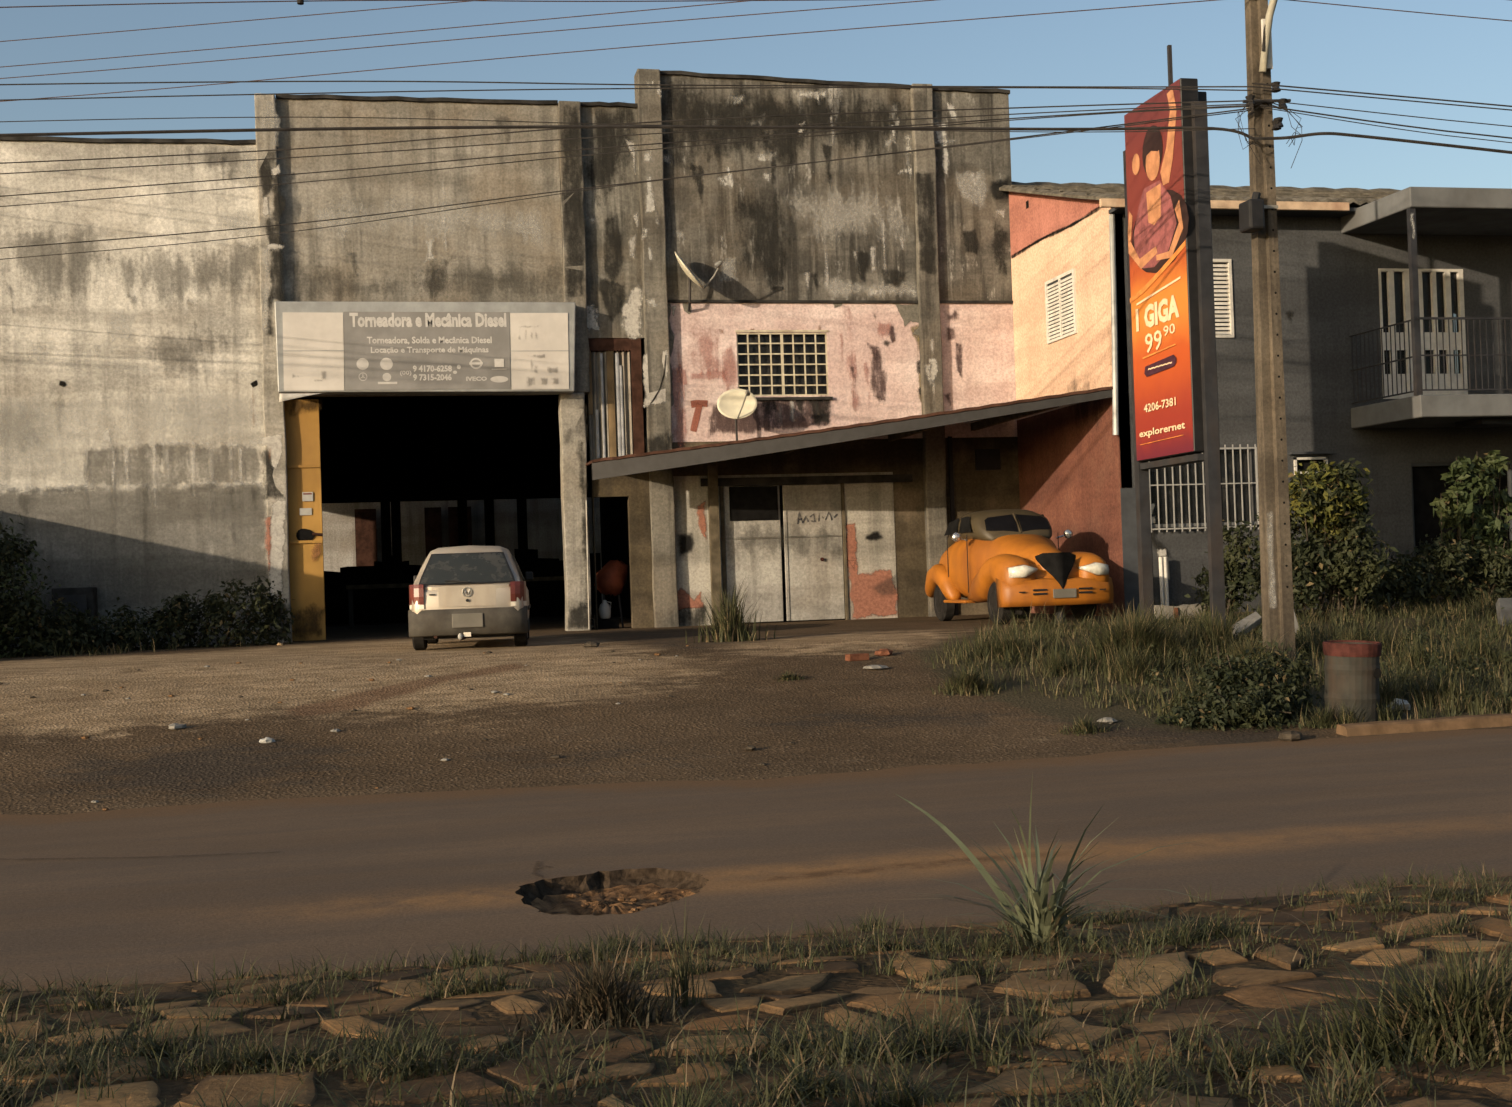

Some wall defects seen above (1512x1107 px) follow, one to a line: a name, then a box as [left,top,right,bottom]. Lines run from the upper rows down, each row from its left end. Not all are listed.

water stain [562,107,656,339]
water stain [652,82,911,287]
water stain [855,104,956,295]
water stain [963,174,1008,274]
water stain [228,441,283,499]